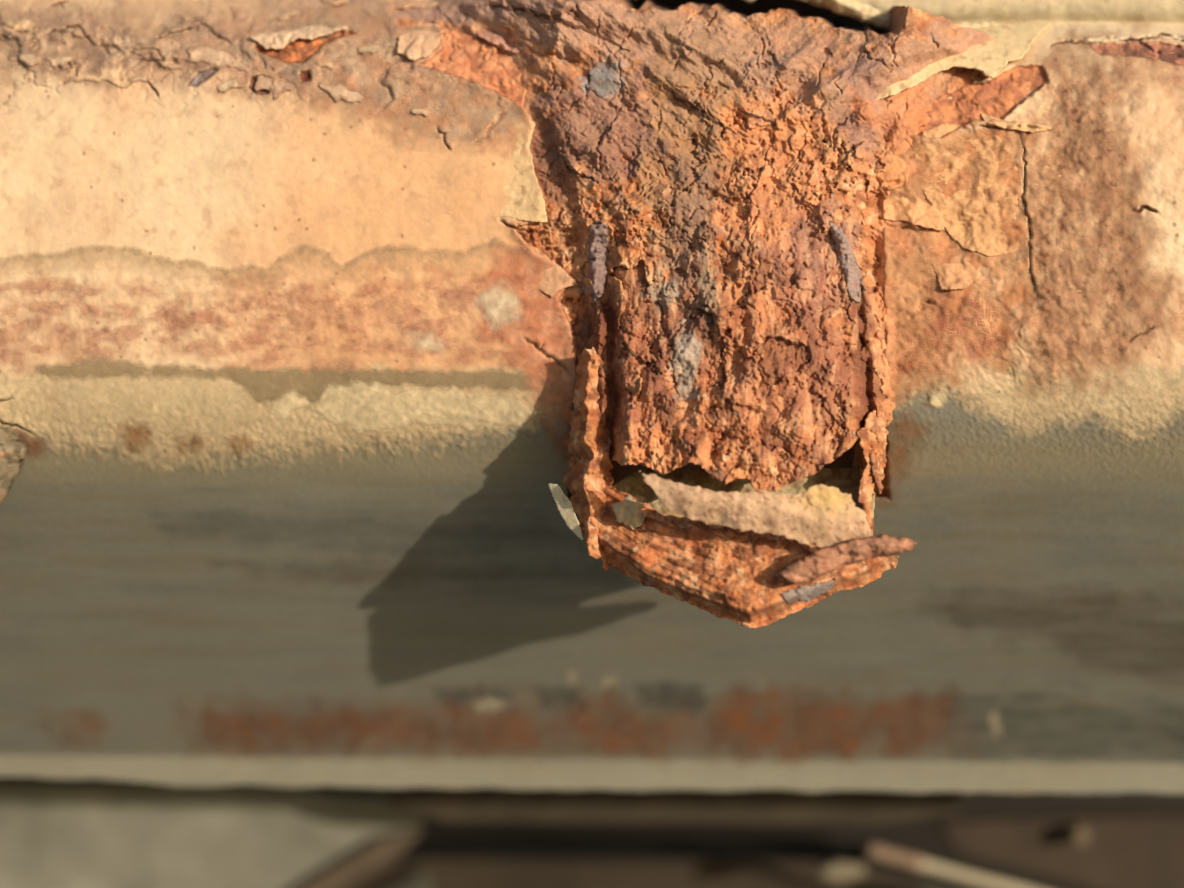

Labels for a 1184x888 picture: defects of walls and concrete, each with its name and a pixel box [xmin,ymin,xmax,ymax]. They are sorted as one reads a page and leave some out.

peeling [8,12,158,89]
peeling [156,8,364,103]
peeling [801,0,890,30]
peeling [1083,33,1184,65]
peeling [397,23,548,223]
peeling [876,21,1052,290]
crack [979,125,1037,295]
rust [872,54,1184,388]
peeling [532,246,577,298]
rust [0,233,580,449]
peeling [672,330,706,401]
crack [0,398,36,435]